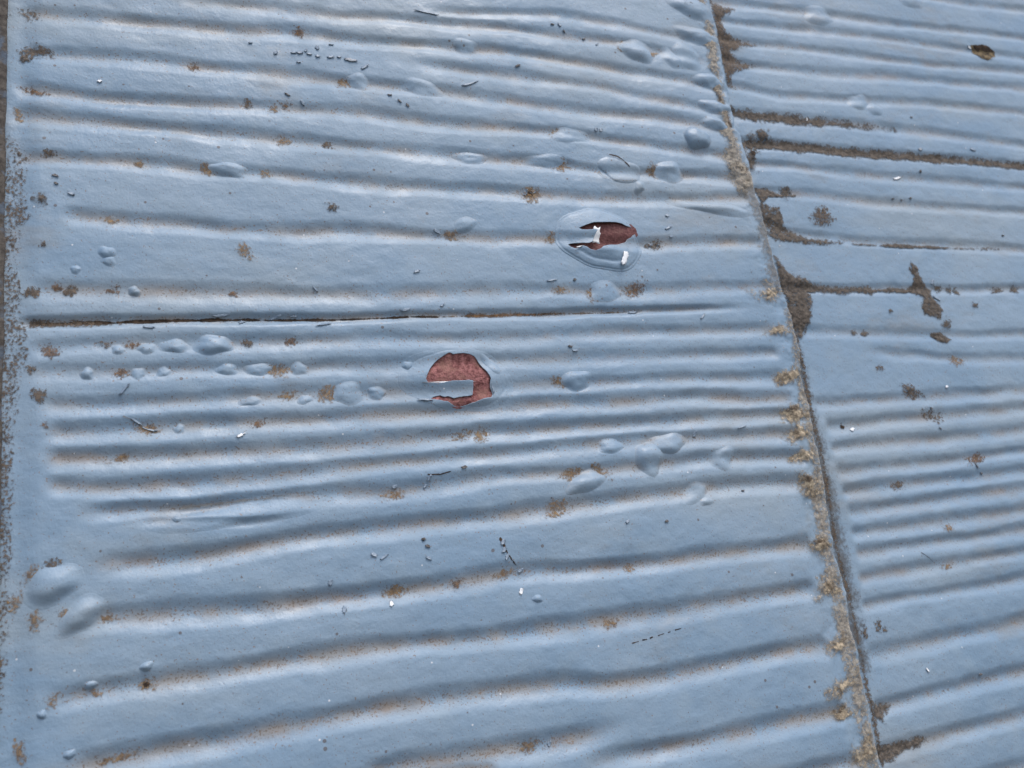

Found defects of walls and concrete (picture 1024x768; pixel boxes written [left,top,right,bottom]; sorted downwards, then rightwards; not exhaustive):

peeling [554,208,642,272]
peeling [398,346,513,412]